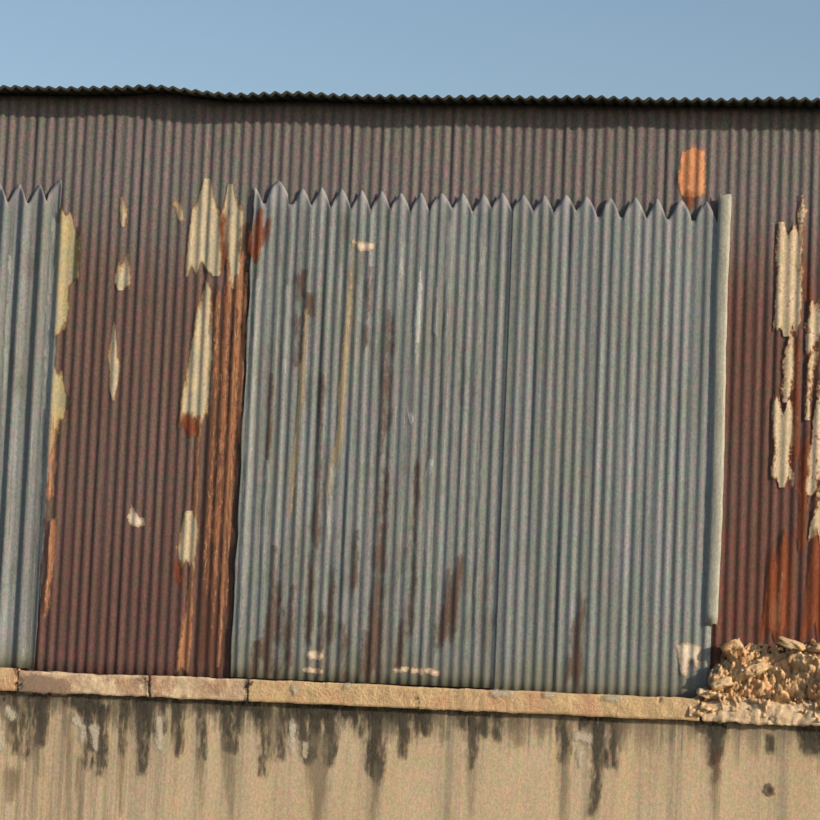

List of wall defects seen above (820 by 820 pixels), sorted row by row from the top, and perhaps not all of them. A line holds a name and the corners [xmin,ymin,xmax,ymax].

corrosion [678,147,707,209]
peeling [45,364,72,499]
peeling [172,179,244,429]
corrosion [173,209,270,672]
corrosion [760,343,820,641]
peeling [770,193,820,545]
corrosion [360,469,389,683]
leakage [0,691,51,756]
leakage [63,694,433,785]
leakage [555,716,623,815]
leakage [695,717,727,782]
spalling [689,635,820,722]